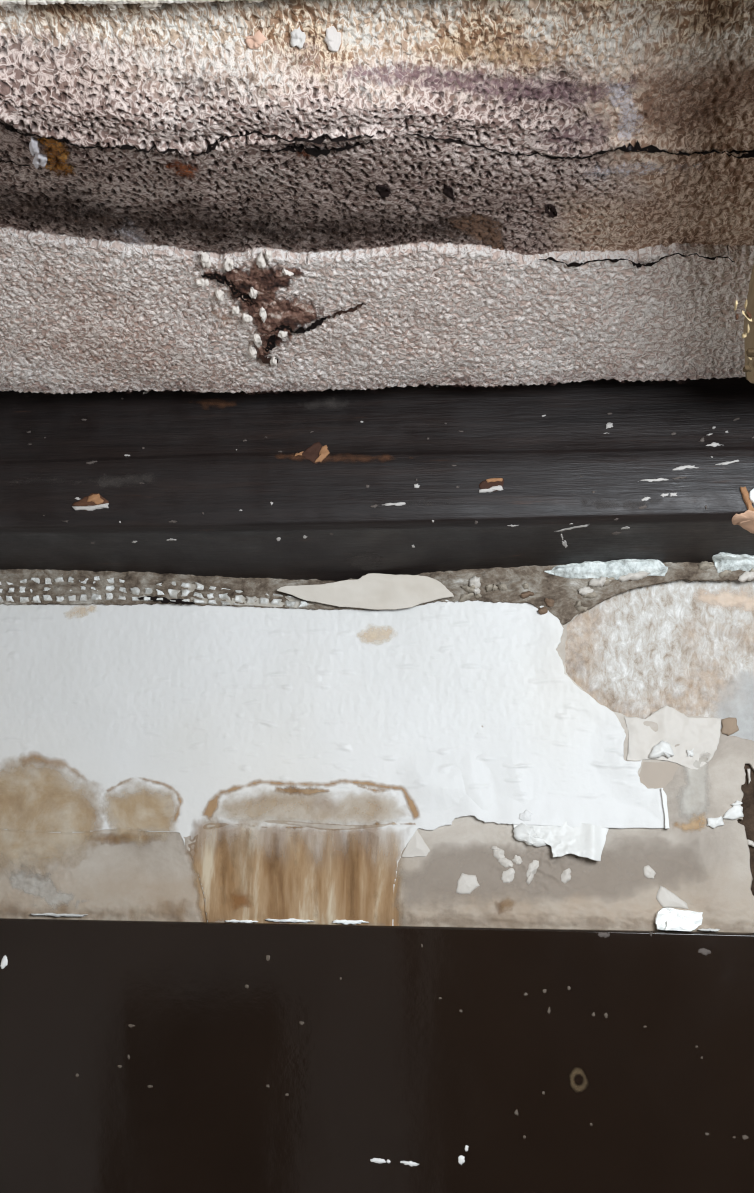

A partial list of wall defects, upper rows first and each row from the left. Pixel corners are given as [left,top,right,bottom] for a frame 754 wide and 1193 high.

damp [348,64,754,143]
crack [0,123,377,166]
damp [0,190,507,251]
flaking render [0,0,754,366]
crack [407,134,754,159]
peeling [732,486,754,534]
peeling [0,573,754,886]
damp [0,755,182,866]
damp [189,780,696,926]
peeling [456,873,480,894]